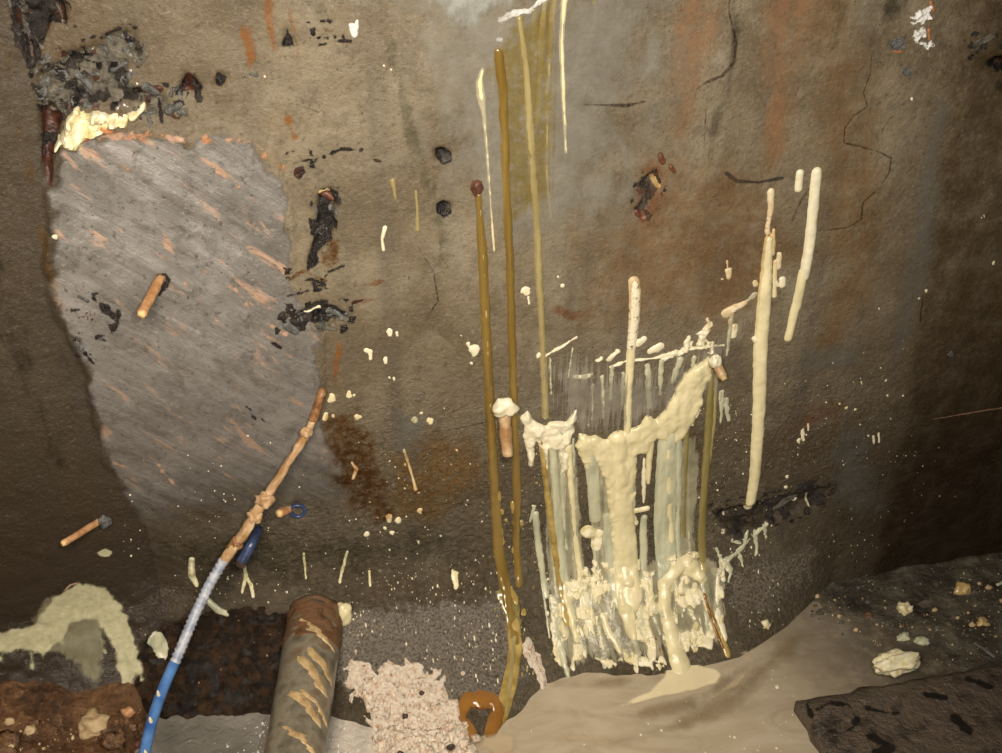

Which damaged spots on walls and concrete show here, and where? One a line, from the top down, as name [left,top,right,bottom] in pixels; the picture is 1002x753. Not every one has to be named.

damp [449,0,494,17]
damp [910,0,935,50]
spalling [8,0,203,186]
spalling [215,72,226,86]
spalling [294,145,374,179]
damp [498,0,568,420]
spalling [271,187,363,349]
spalling [70,293,121,341]
damp [476,37,523,588]
spalling [73,338,95,364]